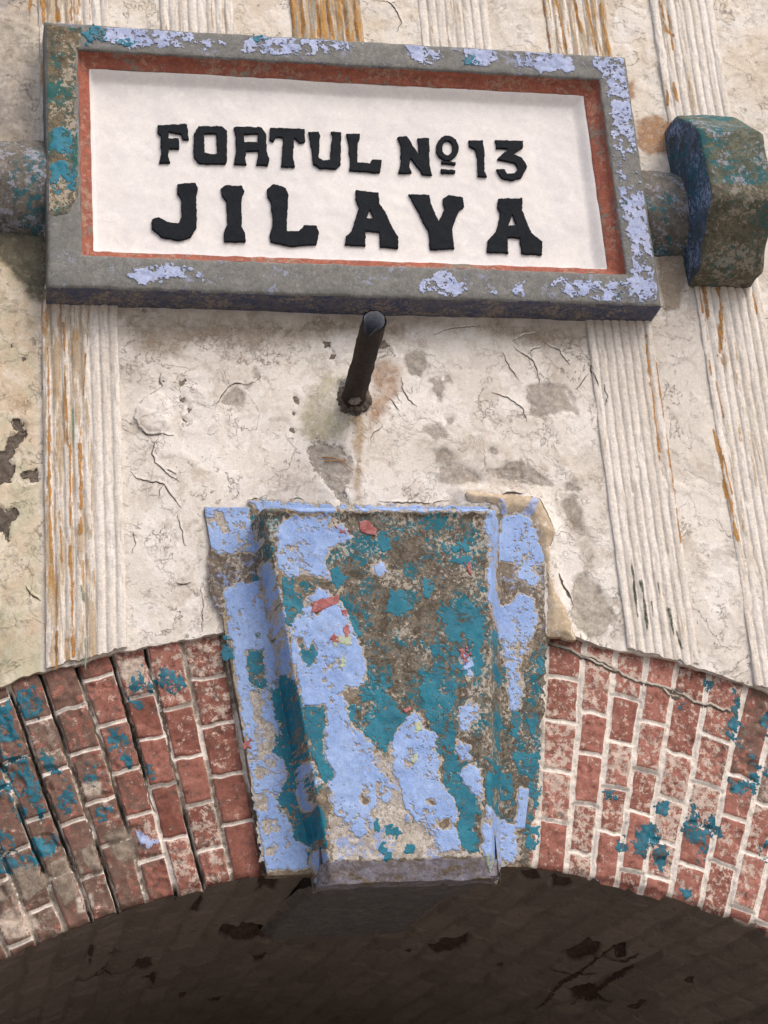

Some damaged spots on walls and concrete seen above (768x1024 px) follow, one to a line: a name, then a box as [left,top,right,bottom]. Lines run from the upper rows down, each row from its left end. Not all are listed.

spalling [0,418,41,485]
corrosion [47,348,83,658]
crack [130,437,188,546]
crack [491,329,610,422]
corrosion [645,334,675,493]
corrosion [699,287,724,418]
corrosion [713,429,740,541]
peeling [207,437,571,889]
crack [548,641,731,714]
peeling [0,685,117,823]
peeling [615,800,670,875]
crack [535,945,639,1010]